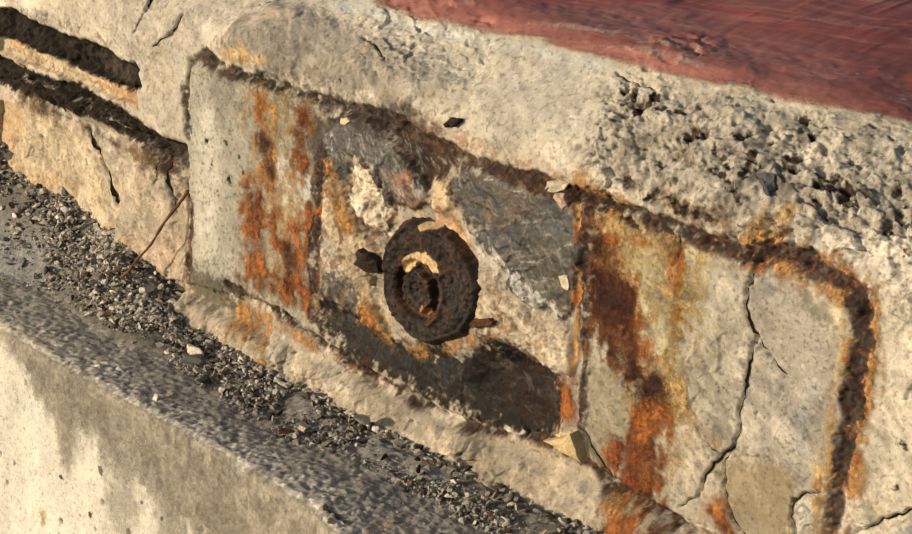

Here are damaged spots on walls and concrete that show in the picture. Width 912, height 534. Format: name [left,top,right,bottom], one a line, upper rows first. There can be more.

spalling [0,6,142,91]
spalling [0,54,190,168]
crack [90,127,120,204]
corrosion [226,82,353,366]
peeling [545,178,569,210]
peeling [558,274,570,291]
damp [0,330,331,534]
corrosion [560,167,714,534]
crack [680,272,787,534]
corrosion [812,254,879,534]
corrosion [686,497,735,534]
crack [859,508,912,531]